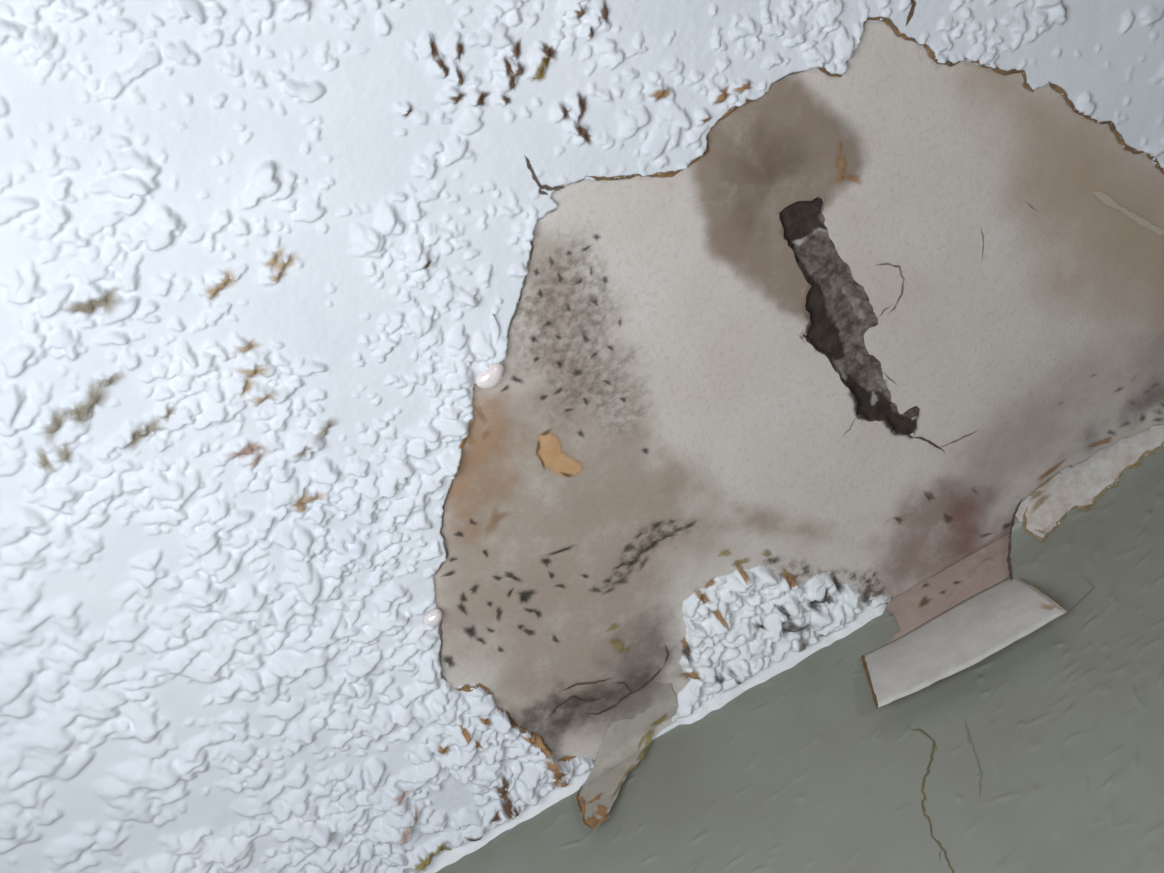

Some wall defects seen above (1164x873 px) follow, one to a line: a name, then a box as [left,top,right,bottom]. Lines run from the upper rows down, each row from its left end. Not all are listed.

water stain [697,79,858,316]
peeling [434,17,1164,829]
water stain [466,602,501,644]
water stain [494,573,540,617]
water stain [542,546,572,588]
water stain [582,521,693,593]
water stain [522,629,669,738]
crack [908,727,954,873]